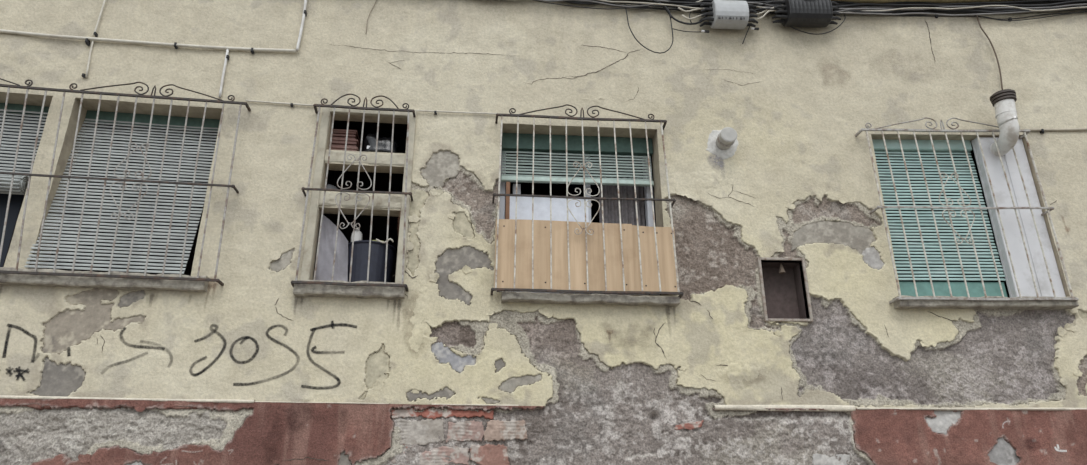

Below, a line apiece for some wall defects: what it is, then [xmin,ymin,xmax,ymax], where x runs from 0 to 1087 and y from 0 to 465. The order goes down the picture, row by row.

crack [528,45,637,84]
spalling [406,151,499,306]
spalling [0,288,253,465]
spalling [338,188,1087,465]